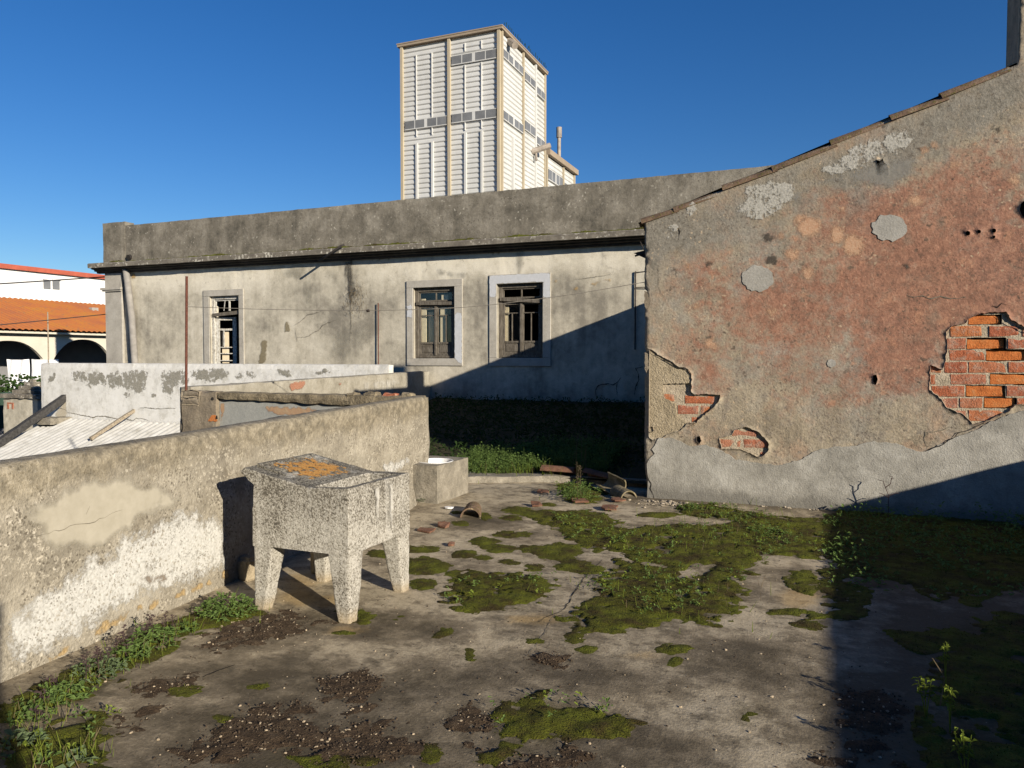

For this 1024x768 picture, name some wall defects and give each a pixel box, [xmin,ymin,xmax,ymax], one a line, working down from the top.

damp [346,261,354,303]
peeling [73,368,255,406]
spalling [644,350,720,439]
flaking render [930,312,1024,424]
flaking render [720,427,769,456]
crack [530,561,601,651]